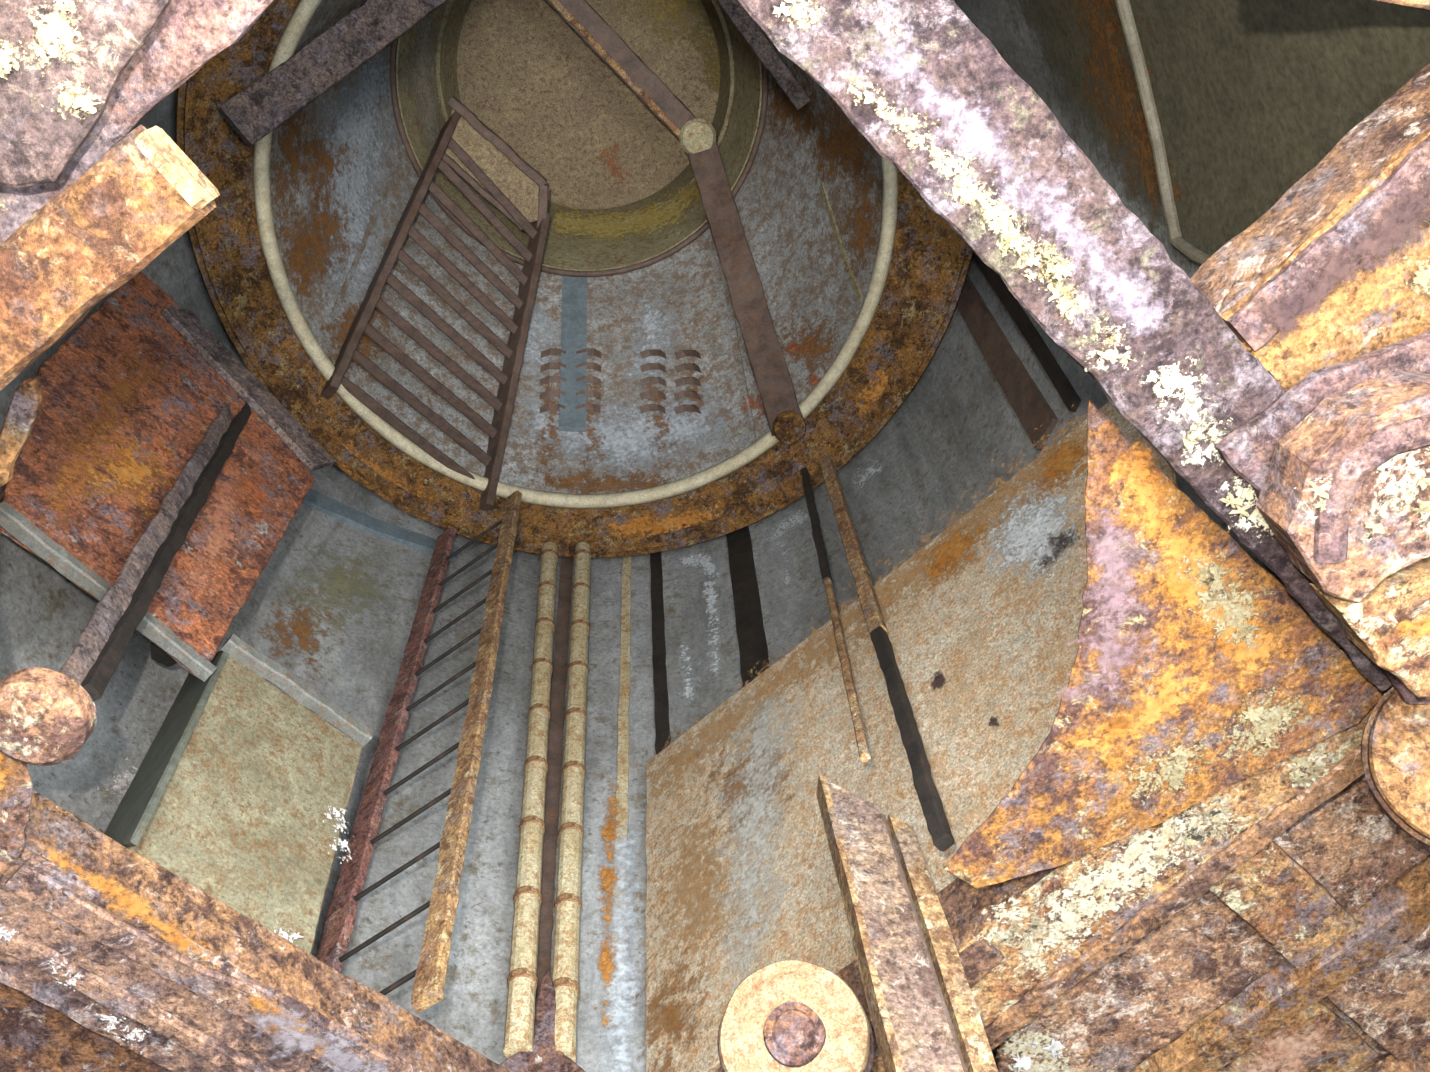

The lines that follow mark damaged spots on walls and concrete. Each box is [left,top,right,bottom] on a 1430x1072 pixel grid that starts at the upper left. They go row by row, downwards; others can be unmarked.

rust [270,111,358,303]
rust [758,64,883,279]
rust [44,346,176,527]
rust [185,468,270,597]
rust [538,372,677,494]
rust [597,500,725,549]
rust [856,367,895,421]
rust [1039,442,1294,783]
rust [632,405,1088,1072]
rust [43,848,216,969]
rust [595,783,620,1025]
rust [246,997,387,1072]